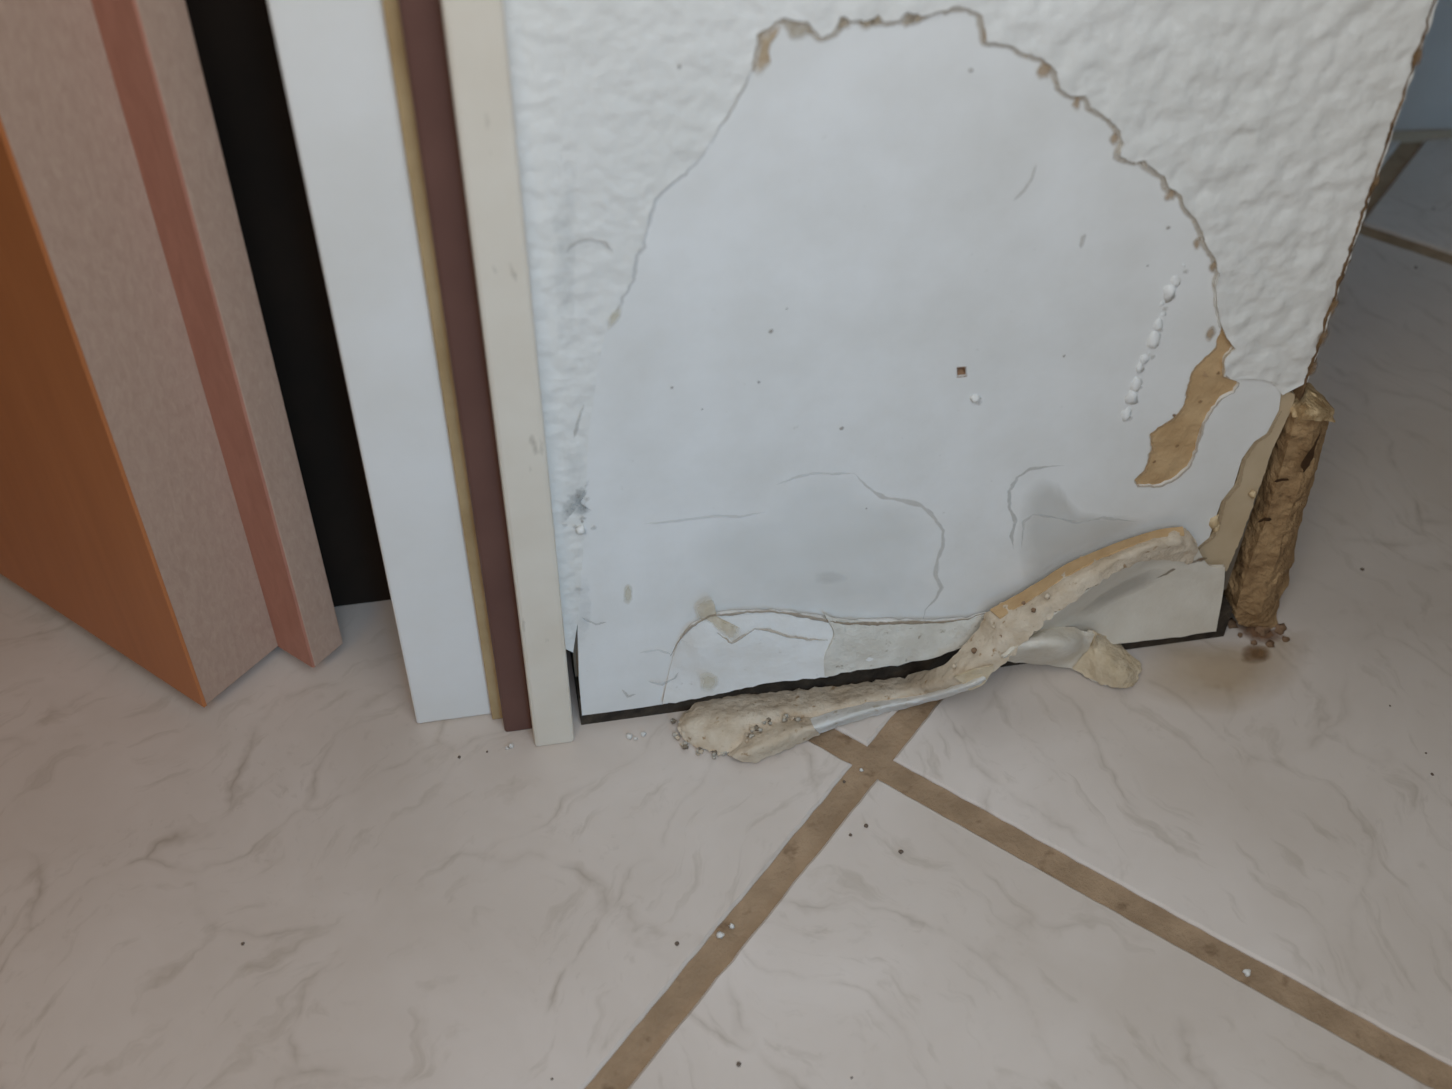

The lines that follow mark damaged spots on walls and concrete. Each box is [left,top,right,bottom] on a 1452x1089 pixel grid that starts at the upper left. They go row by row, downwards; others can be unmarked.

peeling [577,0,1436,763]